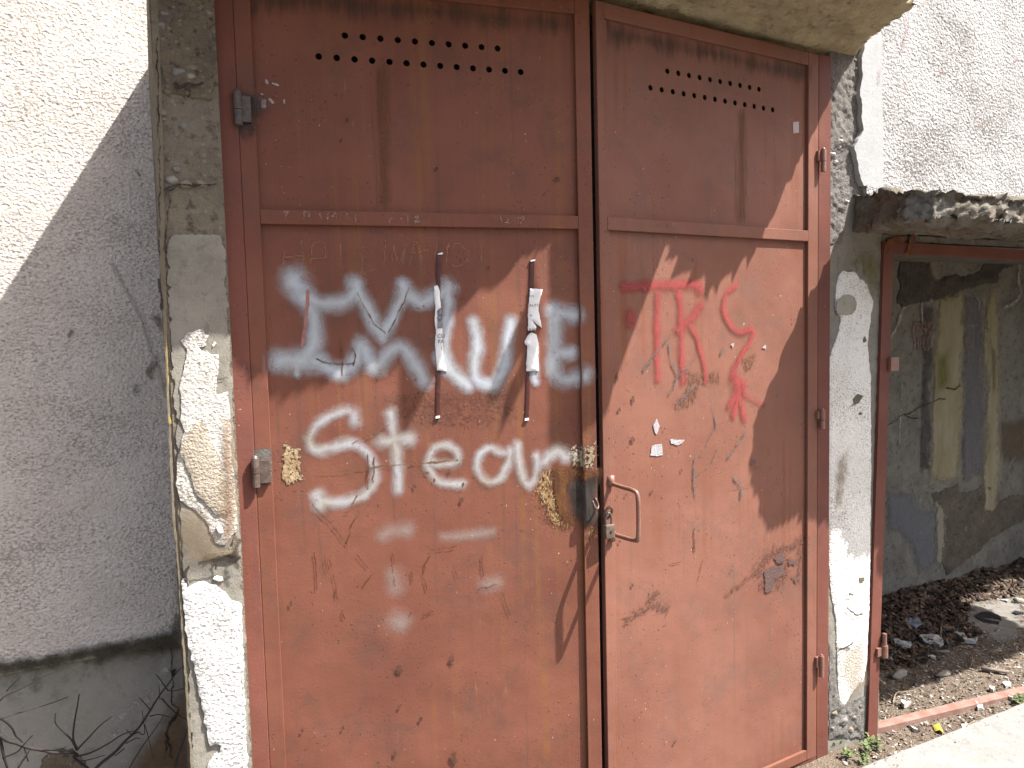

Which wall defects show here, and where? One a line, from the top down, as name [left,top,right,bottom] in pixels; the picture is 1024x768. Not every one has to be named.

spalling [829,49,860,244]
flaking render [176,328,242,569]
rust [534,442,600,545]
flaking render [828,271,873,740]
flaking render [181,575,249,768]